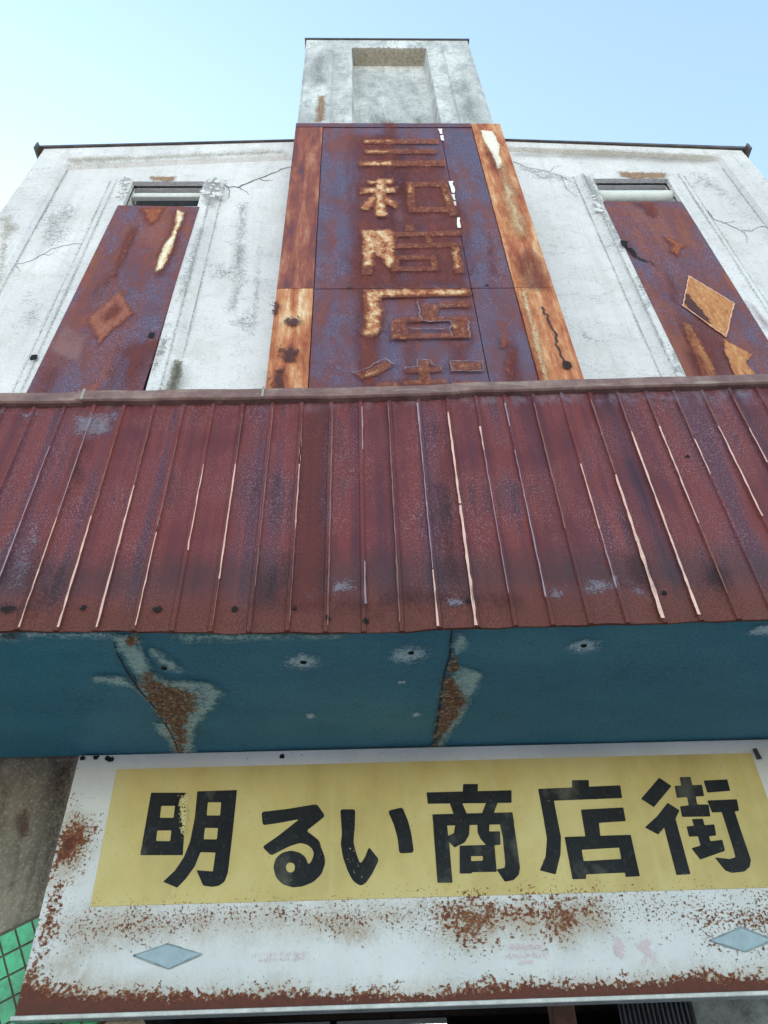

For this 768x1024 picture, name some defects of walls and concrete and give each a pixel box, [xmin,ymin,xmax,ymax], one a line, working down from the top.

crack [224,167,290,195]
rust [114,207,184,274]
rust [682,321,716,376]
rust [723,339,755,375]
rust [747,624,768,636]